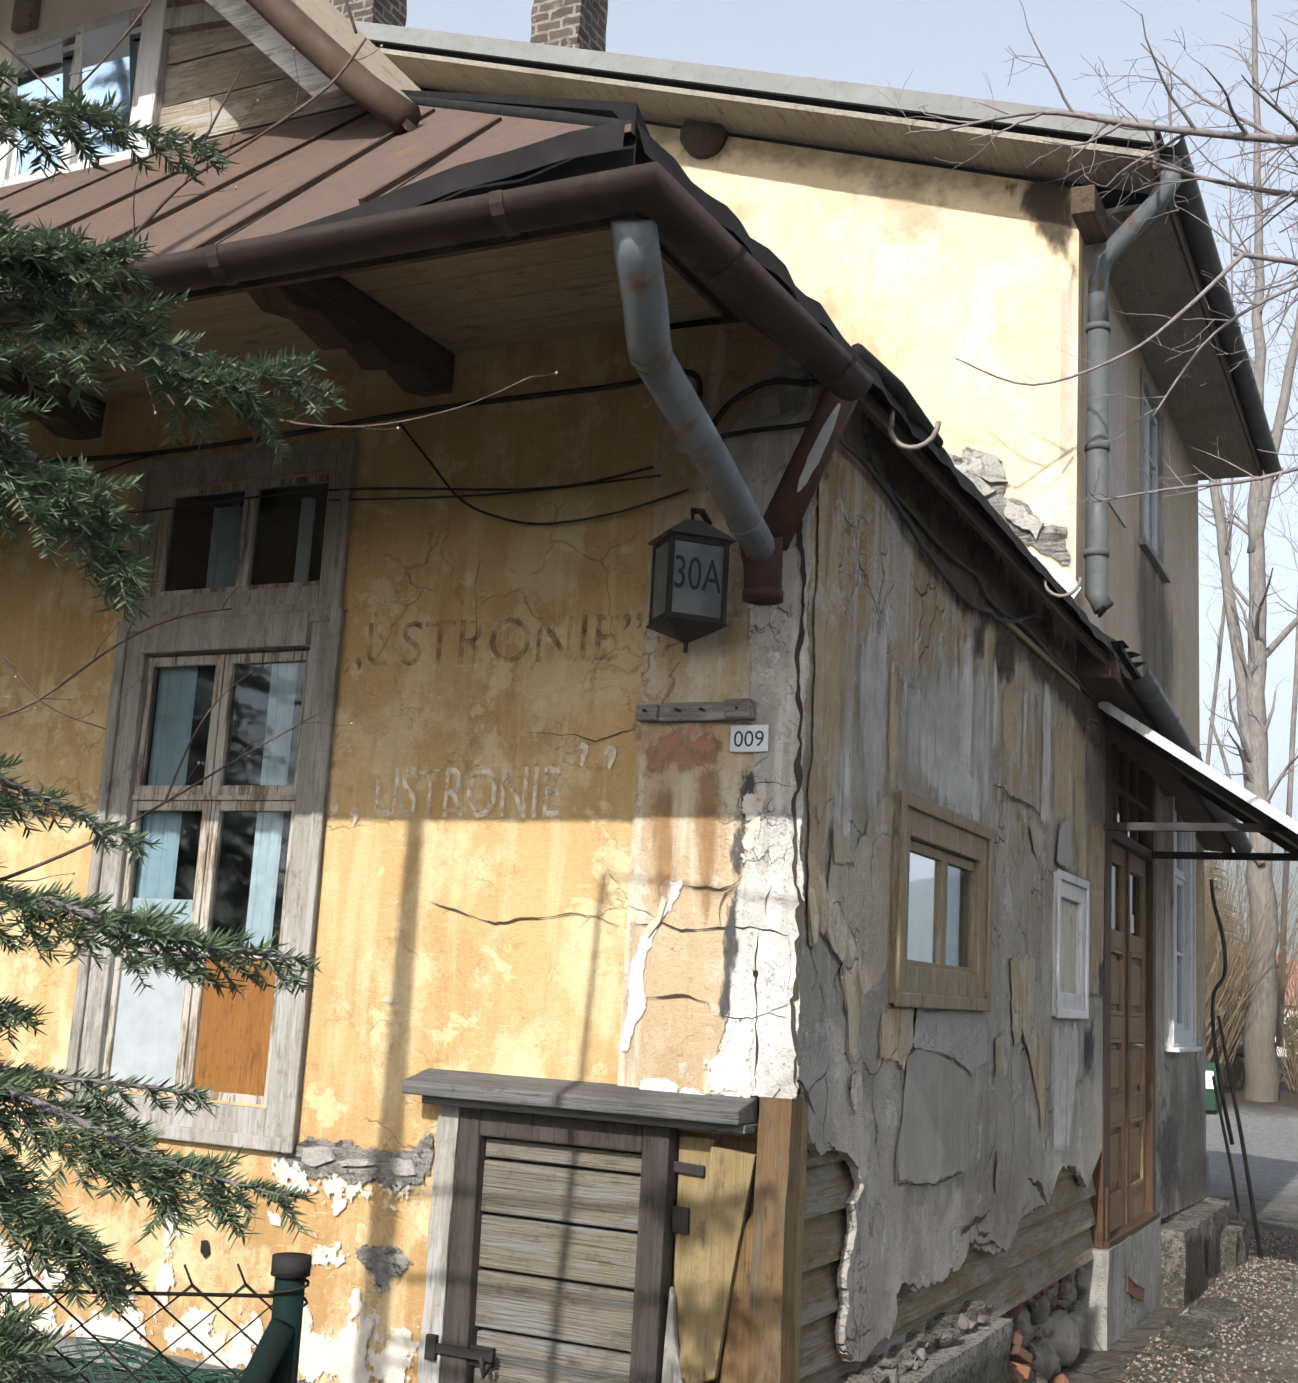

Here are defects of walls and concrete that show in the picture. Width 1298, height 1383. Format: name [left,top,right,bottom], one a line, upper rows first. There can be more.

water stain [1006,176,1072,251]
spalling [948,446,1071,567]
peeling [639,349,895,1111]
crack [428,520,815,1114]
crack [993,783,1042,885]
peeling [618,880,684,1052]
peeling [879,954,1046,1132]
spalling [200,1240,209,1259]
peeling [267,1211,281,1227]
spalling [267,1133,434,1216]
flaking render [308,1233,413,1296]